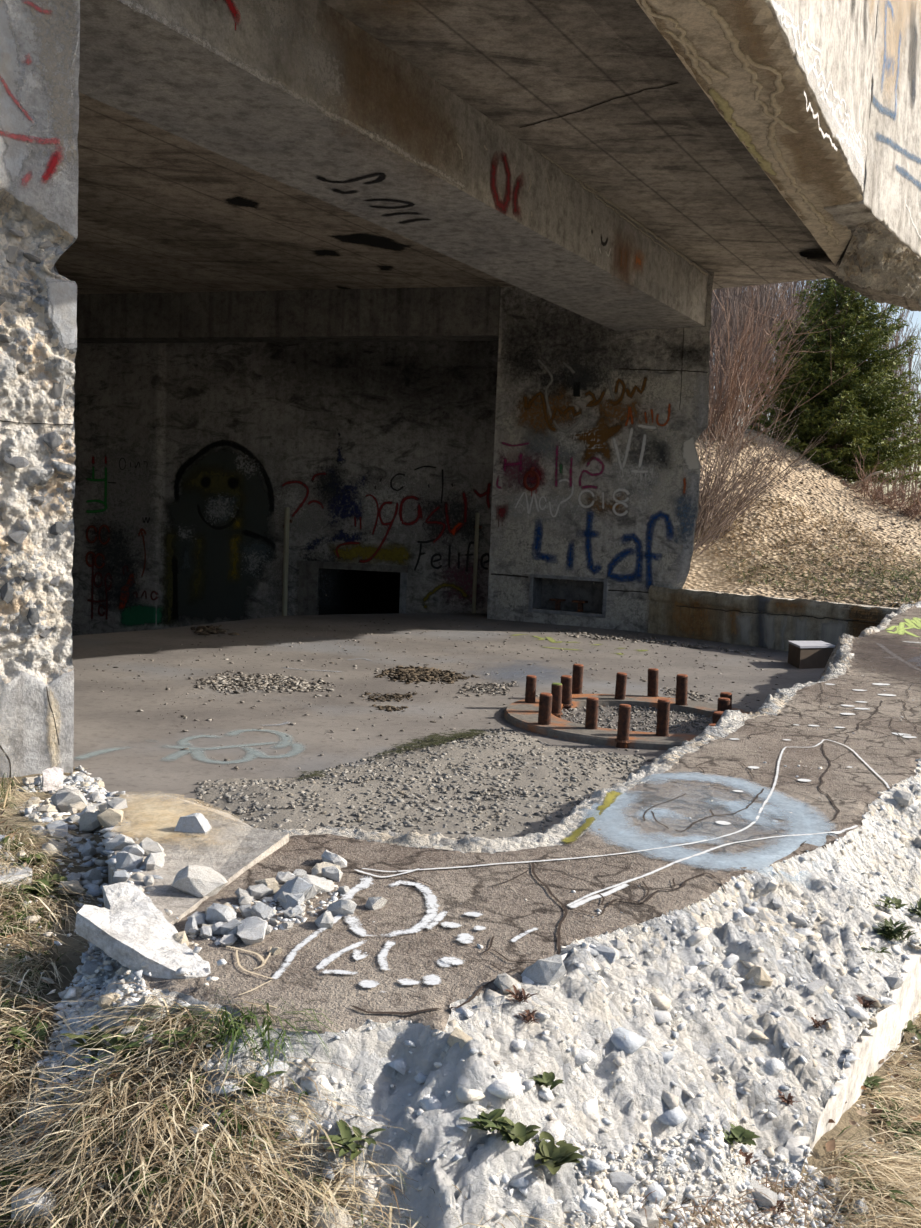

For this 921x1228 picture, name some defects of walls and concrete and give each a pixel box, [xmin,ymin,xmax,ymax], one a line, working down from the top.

leakage [852,0,867,43]
crack [771,0,866,174]
leakage [909,22,917,88]
spalling [798,207,921,312]
spalling [0,0,77,685]
crack [0,418,73,426]
rust [774,599,804,611]
rust [849,606,878,637]
crack [0,745,11,778]
spalling [41,766,63,791]
crack [643,682,921,846]
crack [352,862,727,1015]